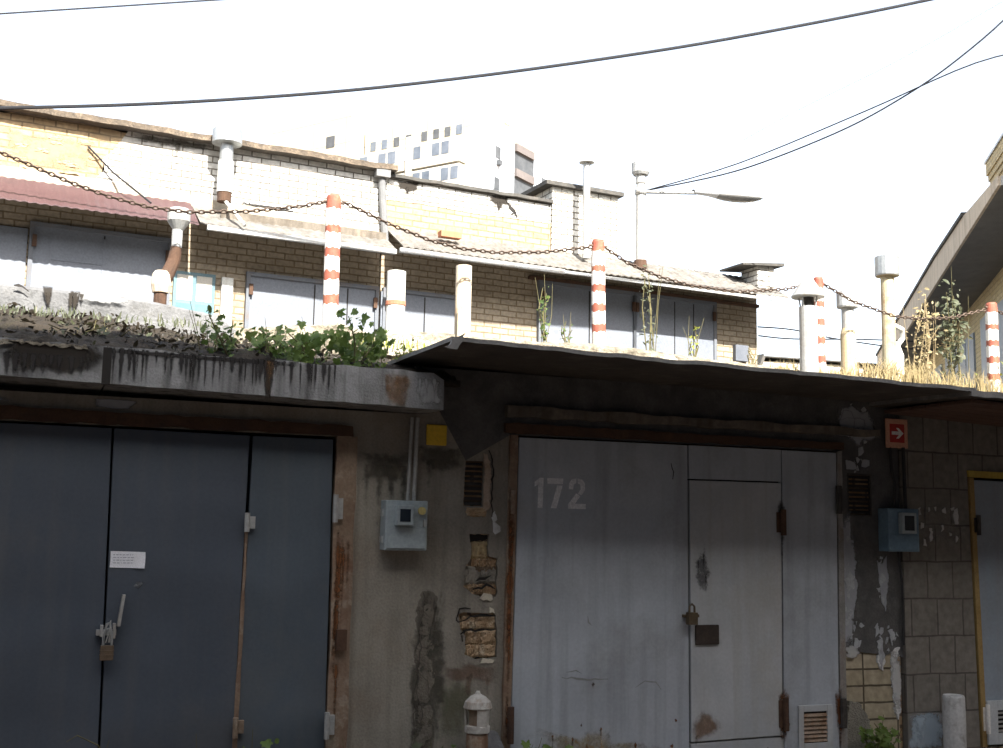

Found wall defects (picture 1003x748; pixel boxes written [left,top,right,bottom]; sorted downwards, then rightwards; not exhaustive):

leakage [3,341,336,397]
spalling [466,450,494,517]
peeling [838,404,875,473]
corrosion [332,542,350,715]
leakage [410,608,444,741]
spalling [456,534,497,663]
corrosion [695,715,716,738]
peeling [843,518,899,670]